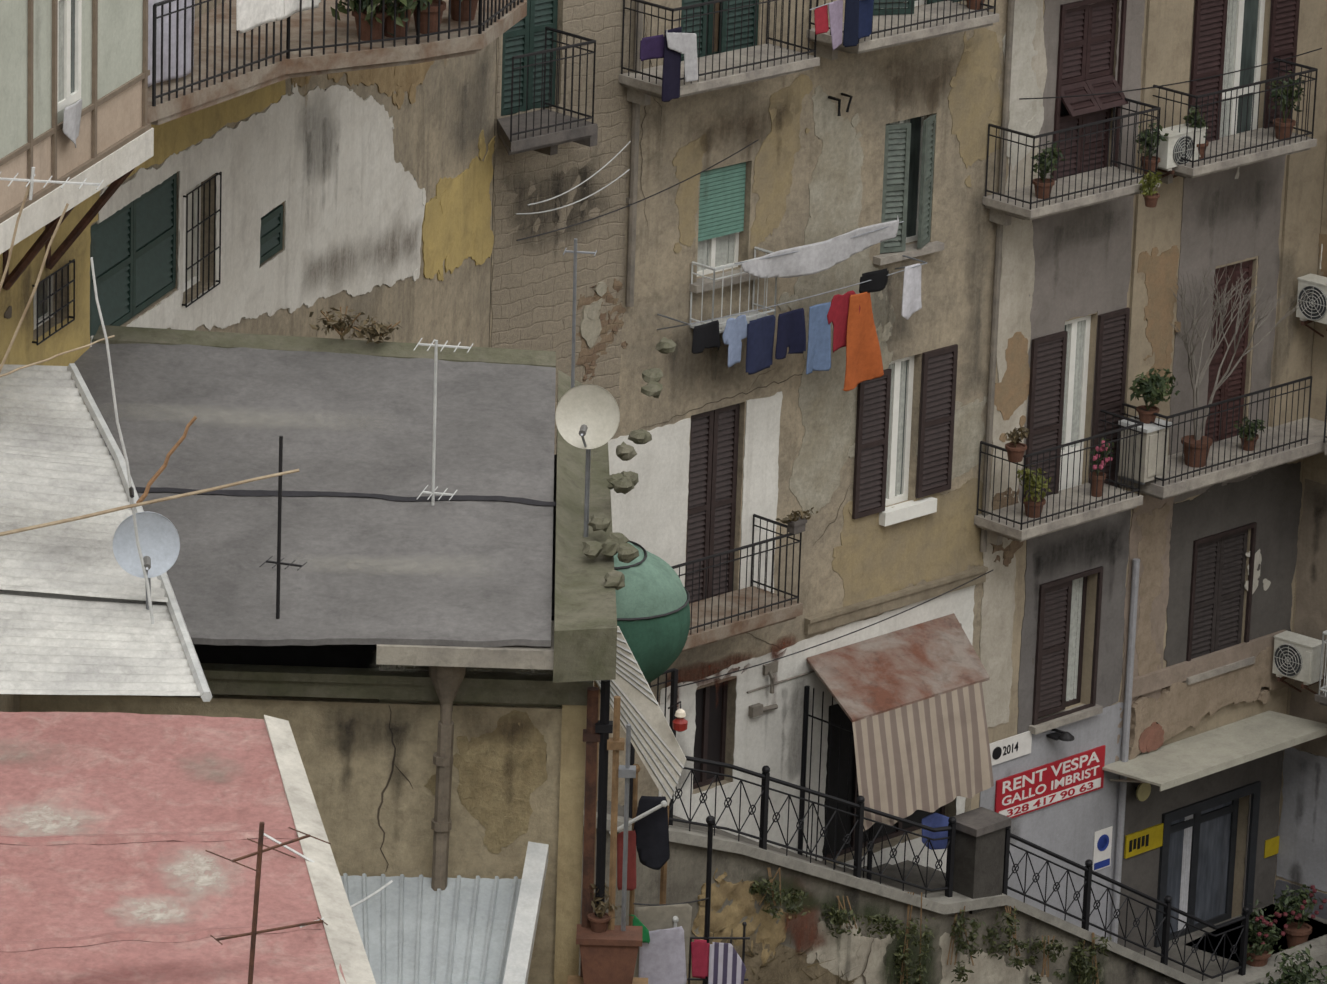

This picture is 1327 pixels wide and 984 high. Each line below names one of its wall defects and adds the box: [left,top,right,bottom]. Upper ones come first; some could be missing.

peeling [412,130,496,282]
spalling [571,279,628,382]
peeling [1137,245,1181,406]
peeling [832,332,1030,607]
crack [377,706,413,872]